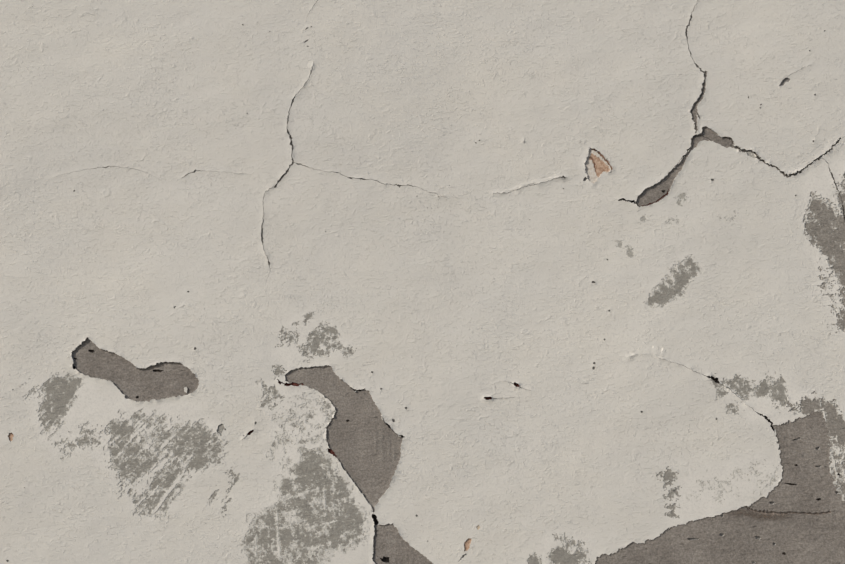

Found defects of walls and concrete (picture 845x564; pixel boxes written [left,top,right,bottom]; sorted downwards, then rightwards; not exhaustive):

crack [261,0,441,282]
peeling [583,148,613,184]
peeling [643,254,702,309]
crack [618,6,845,220]
peeling [803,172,845,335]
peeling [12,337,240,521]
peeling [238,311,433,564]
spalling [527,371,845,564]
crack [660,358,775,432]